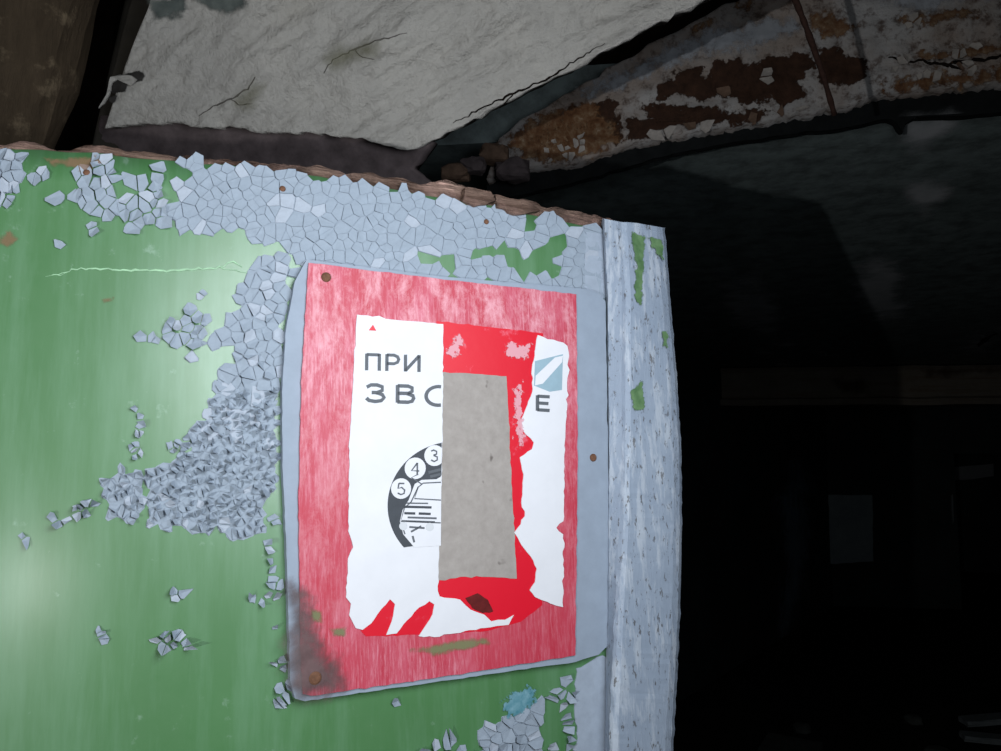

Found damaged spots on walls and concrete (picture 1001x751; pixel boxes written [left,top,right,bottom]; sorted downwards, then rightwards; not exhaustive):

crack [199,77,255,116]
crack [324,33,406,73]
spalling [568,17,868,147]
crack [888,54,1001,70]
rust [506,102,621,164]
peeling [544,132,585,163]
peeling [0,148,50,209]
peeling [45,152,606,608]
peeling [149,629,197,656]
peeling [270,656,292,709]
peeling [420,728,467,751]
peeling [477,675,580,751]